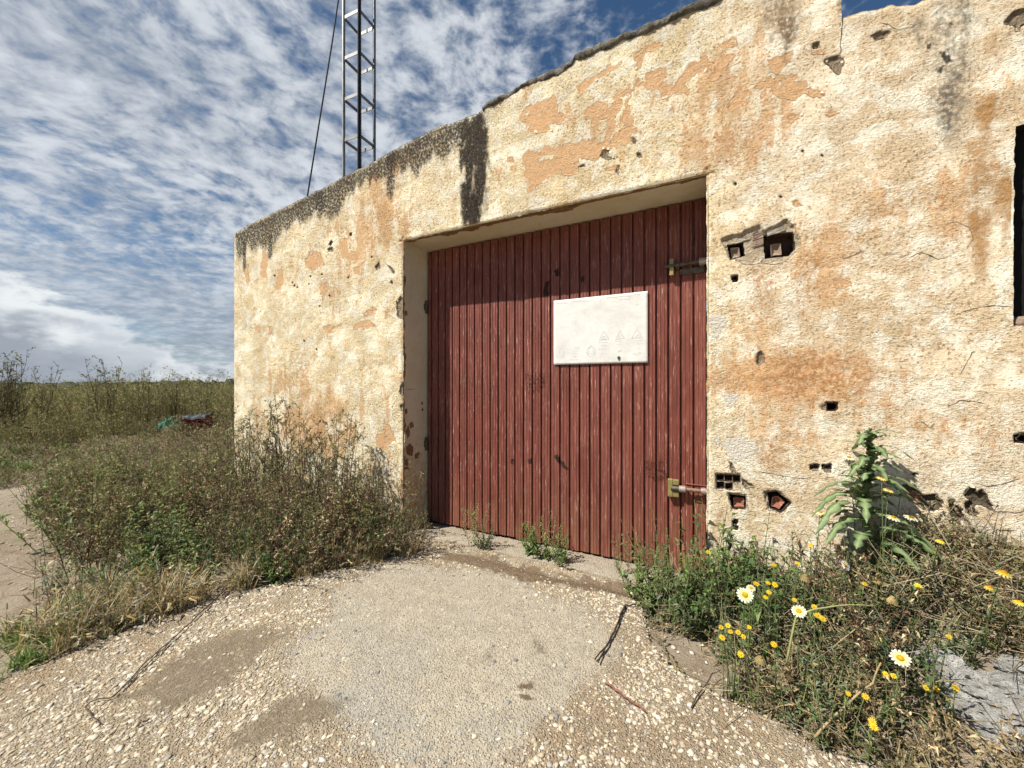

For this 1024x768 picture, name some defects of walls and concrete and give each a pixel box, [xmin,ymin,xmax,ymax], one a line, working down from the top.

damp [236,112,489,270]
peeling [507,36,743,193]
spalling [721,219,801,265]
spalling [244,174,707,526]
spalling [715,461,793,529]
flaking render [902,473,999,527]